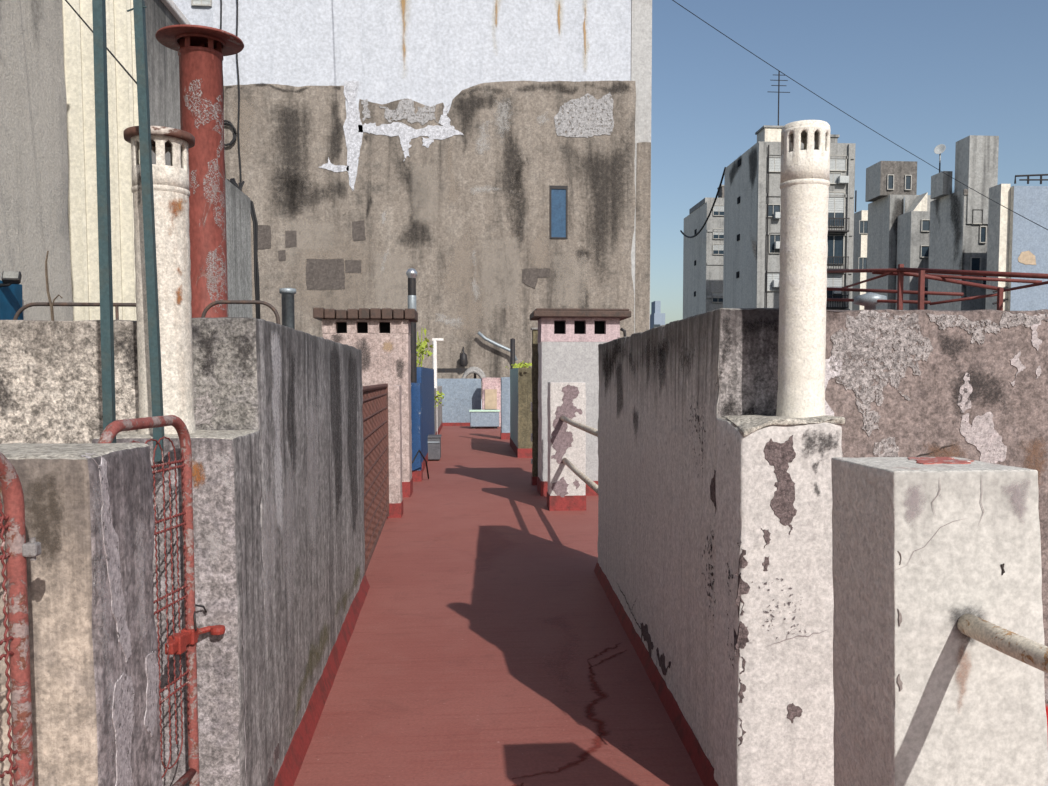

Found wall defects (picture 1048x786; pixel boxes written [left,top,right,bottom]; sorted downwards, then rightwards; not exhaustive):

water stain [272,106,345,211]
peeling [361,98,456,160]
water stain [399,161,425,243]
water stain [458,89,525,246]
peeling [554,92,614,138]
water stain [577,144,630,264]
peeling [551,385,582,464]
water stain [603,339,669,411]
peeling [824,310,1048,464]
flaking render [764,435,797,534]
flaking render [761,528,771,571]
spalling [734,542,750,703]